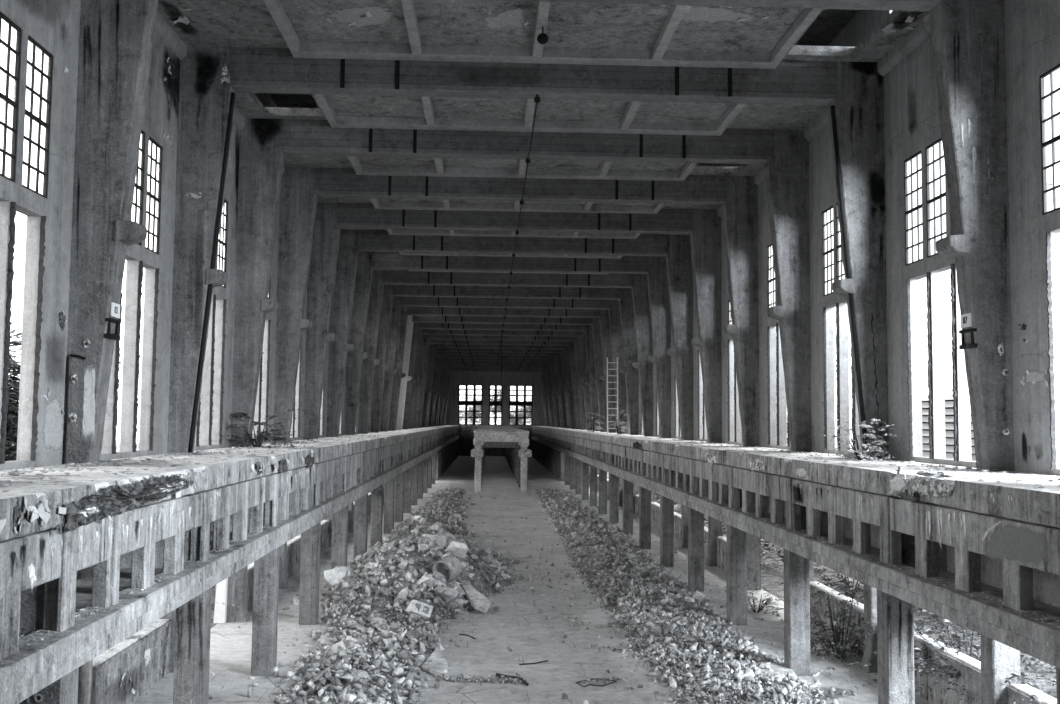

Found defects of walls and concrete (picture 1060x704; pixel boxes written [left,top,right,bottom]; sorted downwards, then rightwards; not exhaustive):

damp [869,172,885,217]
spalling [14,474,194,534]
spalling [889,469,959,501]